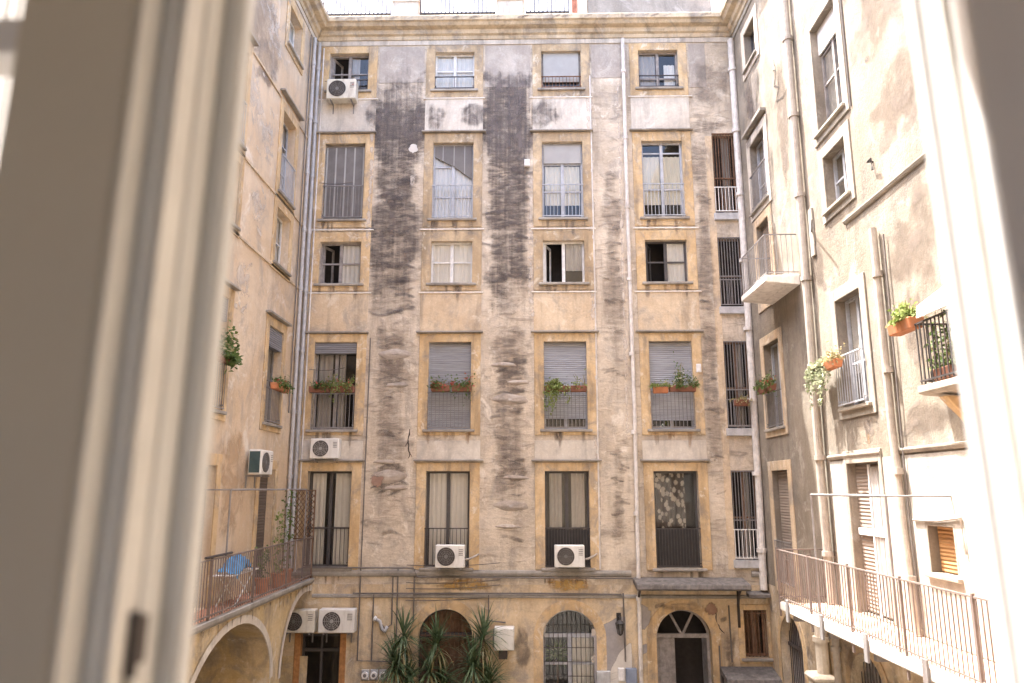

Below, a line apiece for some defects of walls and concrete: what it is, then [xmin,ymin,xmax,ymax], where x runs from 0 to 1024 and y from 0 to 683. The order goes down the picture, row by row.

water stain [367,82,439,294]
water stain [464,73,557,298]